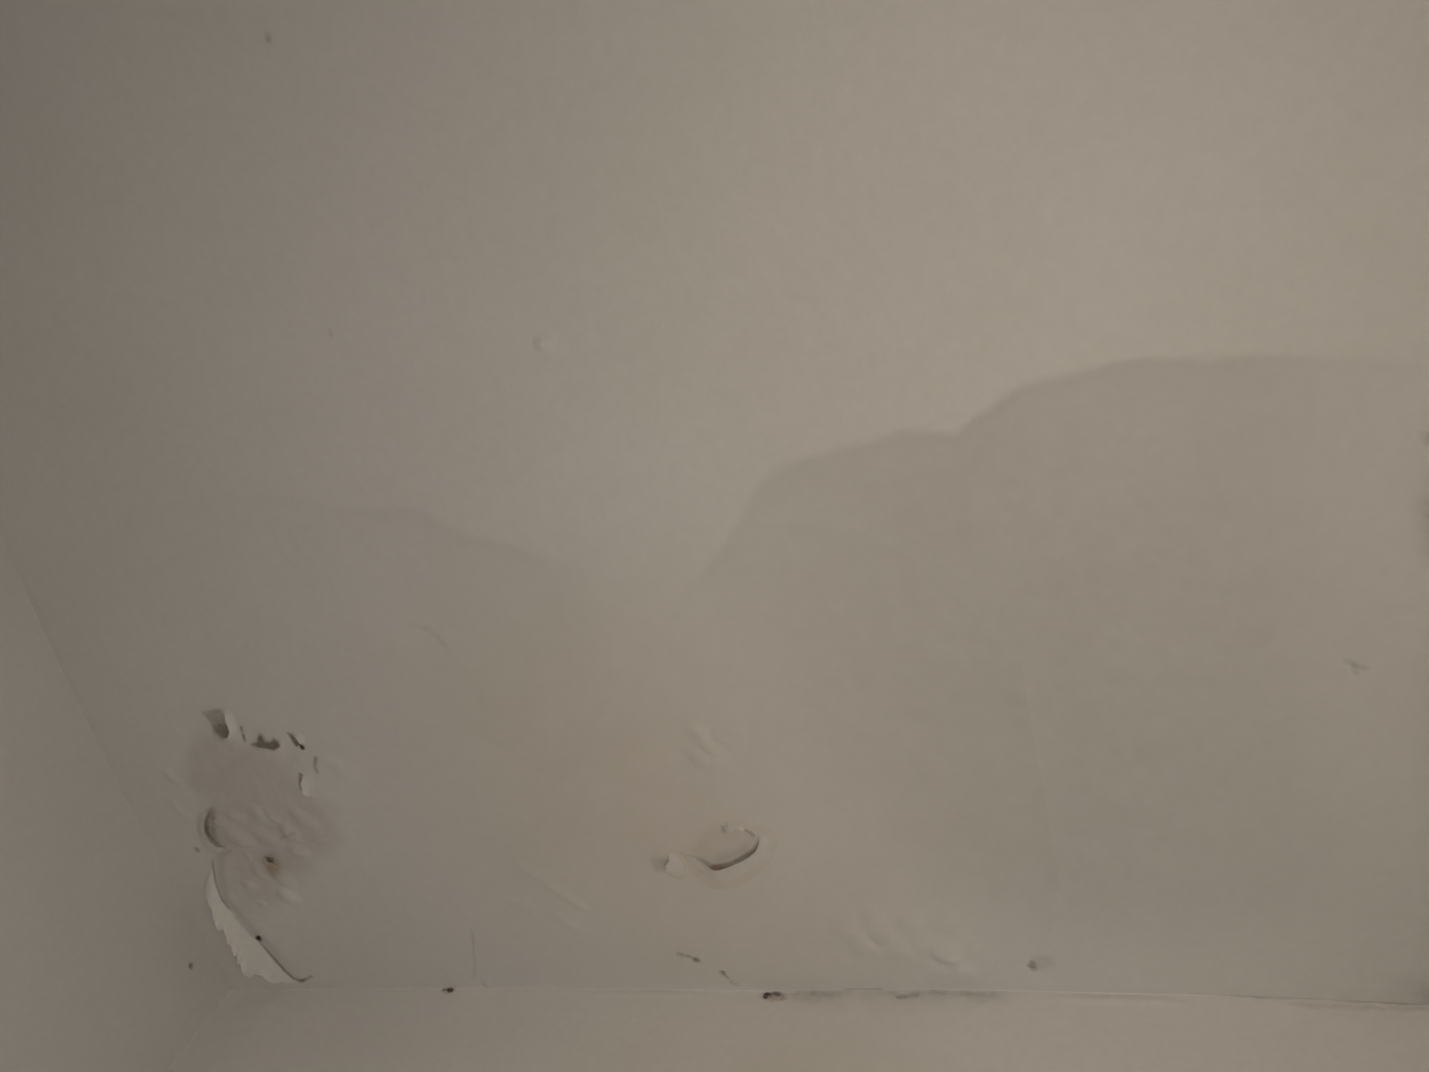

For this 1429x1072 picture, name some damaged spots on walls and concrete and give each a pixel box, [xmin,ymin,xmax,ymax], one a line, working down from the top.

peeling [205,867,300,984]